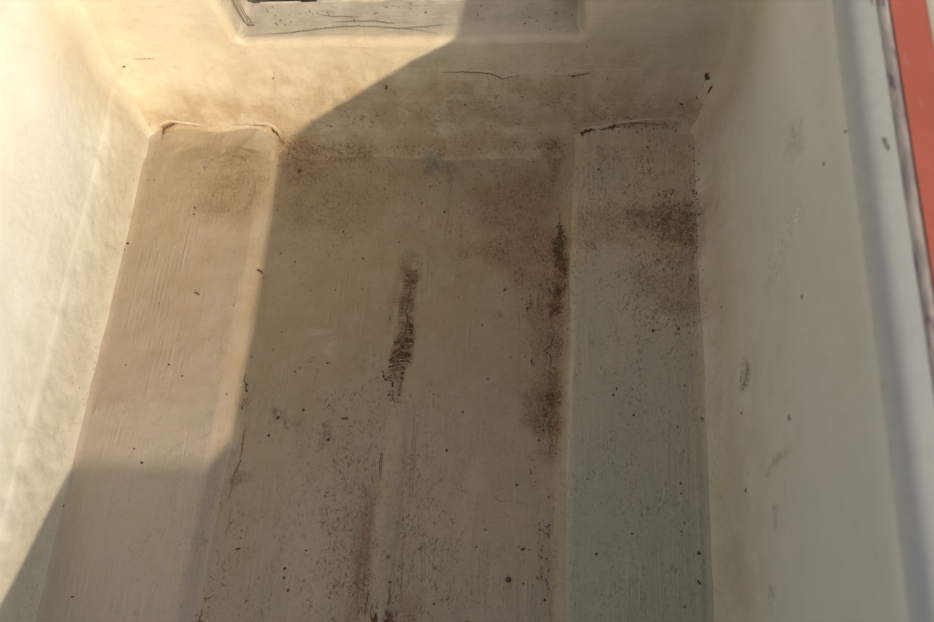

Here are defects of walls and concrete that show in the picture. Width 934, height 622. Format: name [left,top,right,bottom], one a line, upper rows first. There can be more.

crack [397,66,684,89]